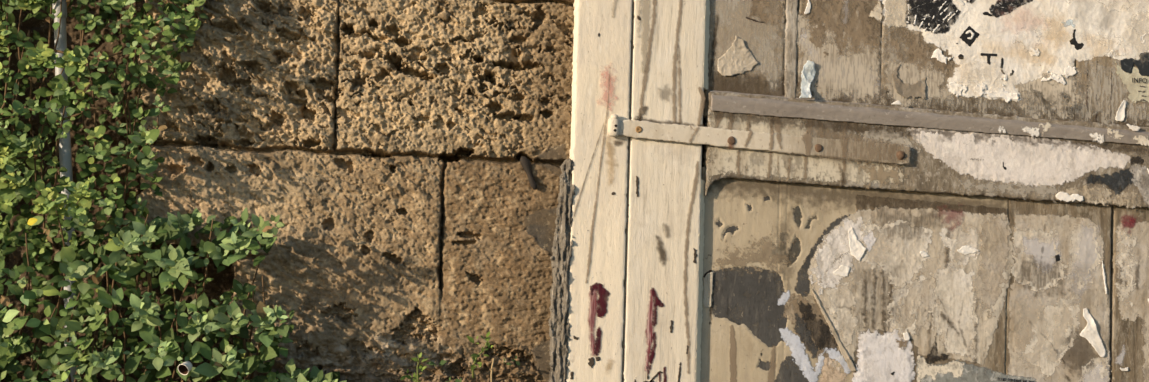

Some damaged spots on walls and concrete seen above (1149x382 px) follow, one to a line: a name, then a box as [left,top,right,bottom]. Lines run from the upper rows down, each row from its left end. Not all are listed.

peeling [693,206,851,382]